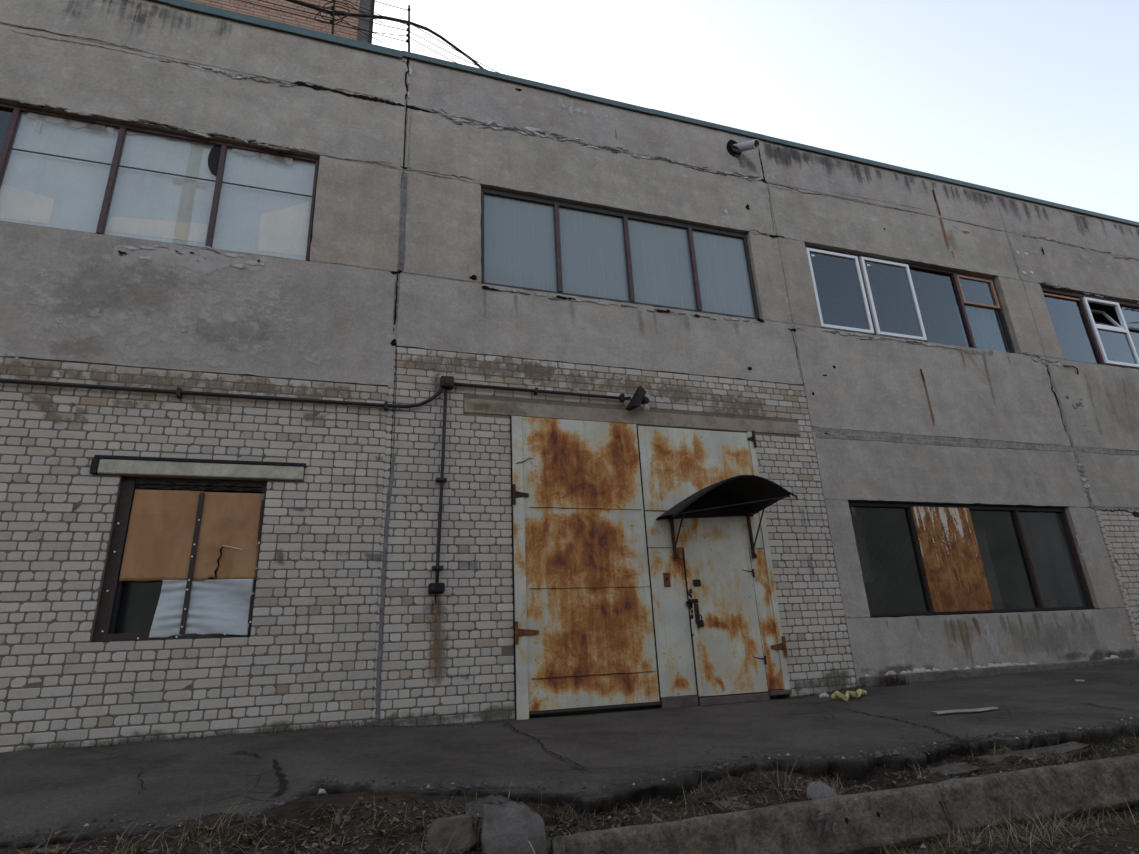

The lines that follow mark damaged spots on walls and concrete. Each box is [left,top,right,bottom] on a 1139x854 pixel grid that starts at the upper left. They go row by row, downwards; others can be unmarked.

crack [0,23,200,67]
crack [403,58,412,105]
crack [326,155,479,182]
spalling [110,244,268,273]
spalling [469,274,765,323]
rust [911,506,994,660]
rust [427,599,447,682]
crack [230,751,296,799]